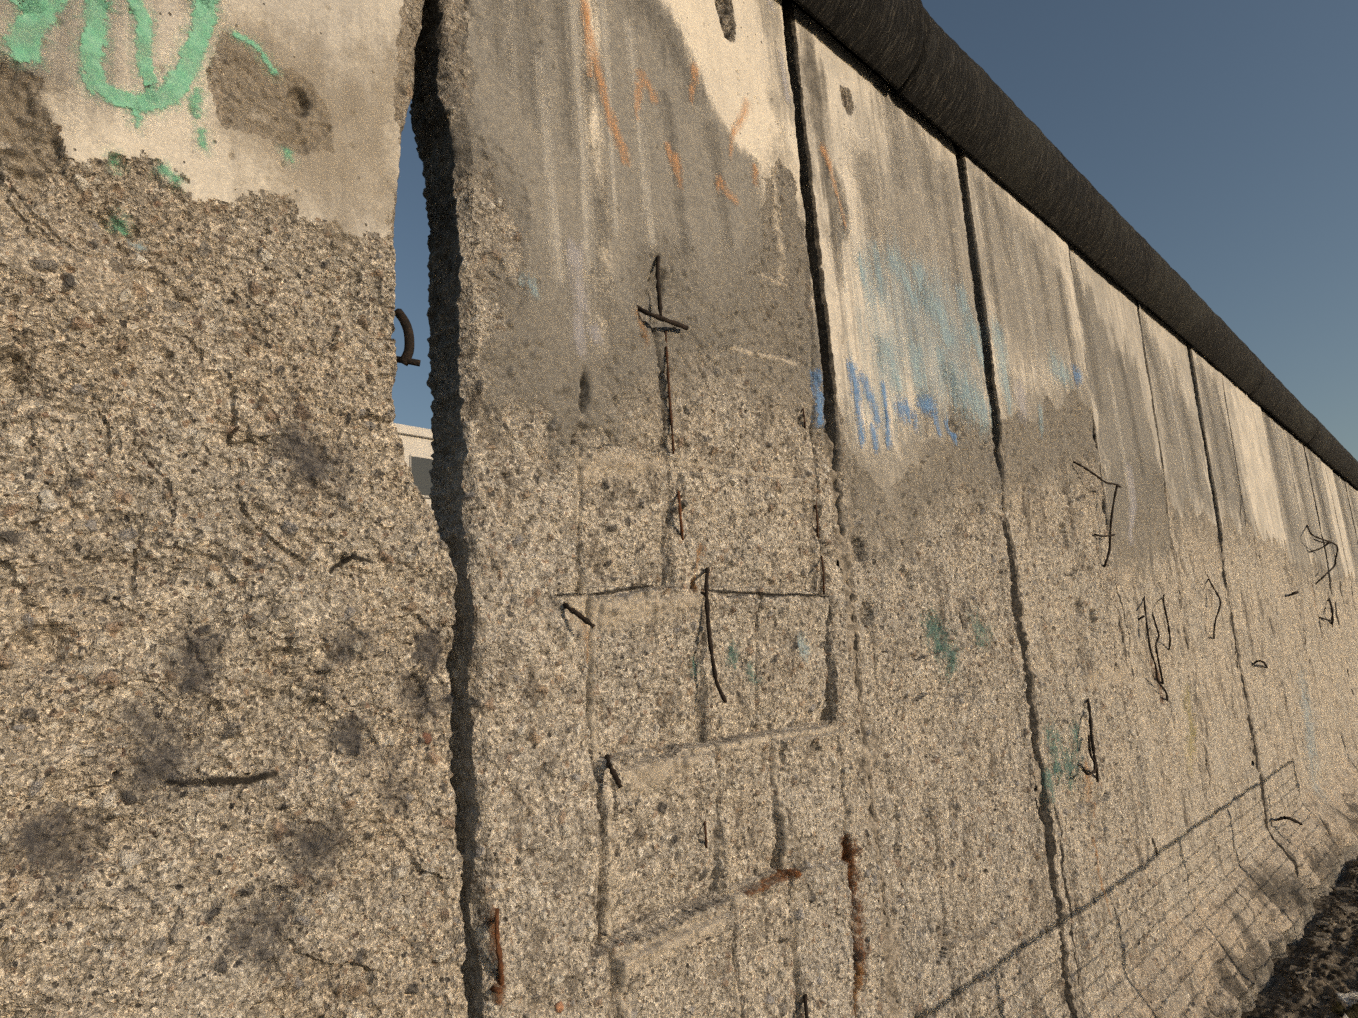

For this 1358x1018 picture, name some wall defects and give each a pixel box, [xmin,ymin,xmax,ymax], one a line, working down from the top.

spalling [206,30,335,155]
spalling [393,0,425,147]
spalling [0,50,468,1018]
spalling [435,0,1358,1018]
corrosion [742,868,803,897]
corrosion [841,834,867,984]
crack [1054,807,1080,985]